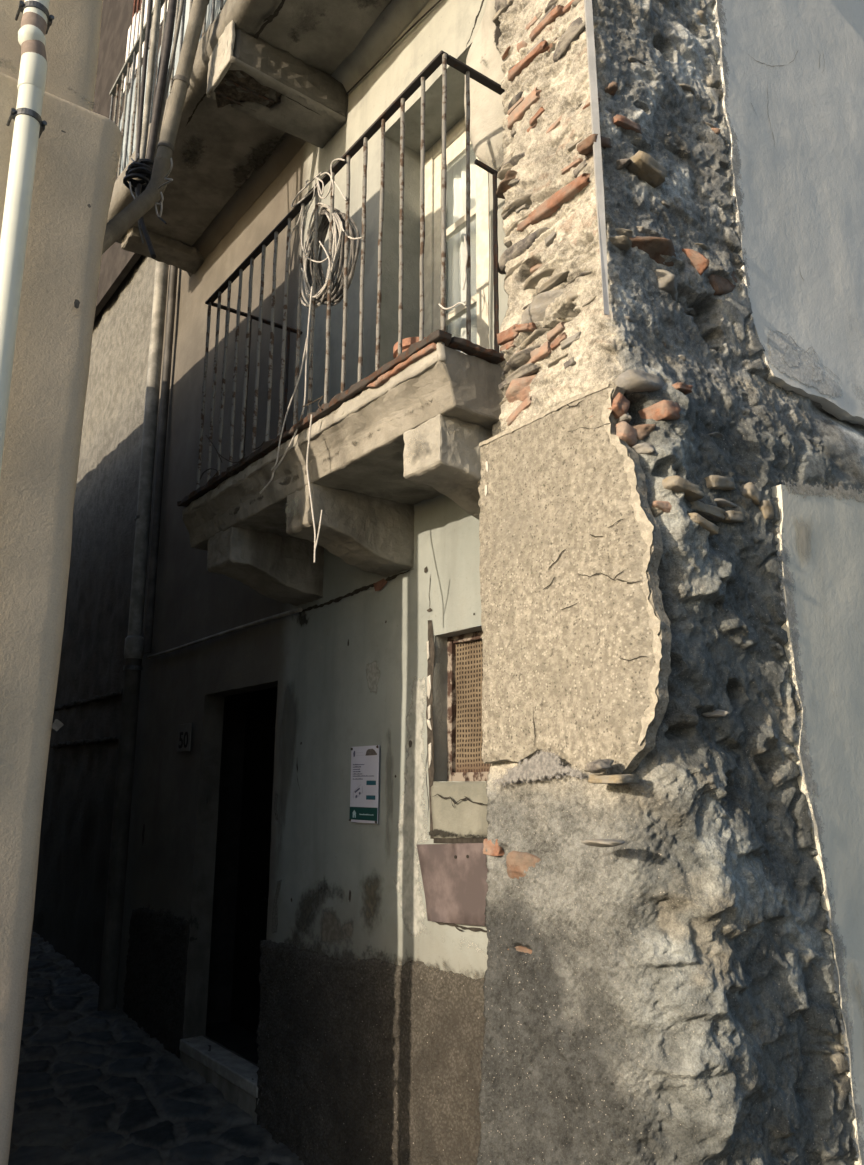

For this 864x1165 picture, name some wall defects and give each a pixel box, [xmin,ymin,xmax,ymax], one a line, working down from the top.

crack [543,518,639,610]
spalling [476,0,864,1165]
crack [425,757,487,810]
water stain [284,877,484,982]